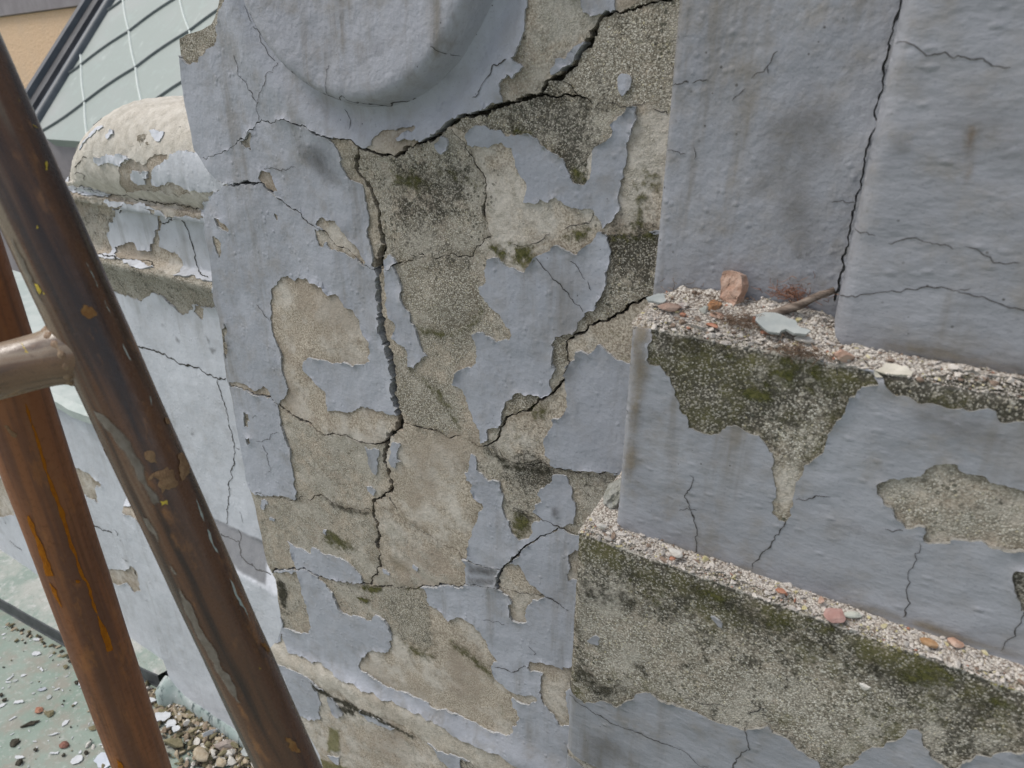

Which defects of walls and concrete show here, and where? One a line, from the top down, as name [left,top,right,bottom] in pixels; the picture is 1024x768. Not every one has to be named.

crack [365,0,671,155]
crack [897,41,1009,69]
peeling [66,96,229,319]
crack [513,215,655,338]
crack [839,286,1024,311]
crack [138,346,278,532]
crack [388,419,405,448]
crack [493,379,565,442]
peeling [230,0,1024,768]
peeling [76,468,101,502]
peeling [109,566,141,592]
crack [886,529,921,617]